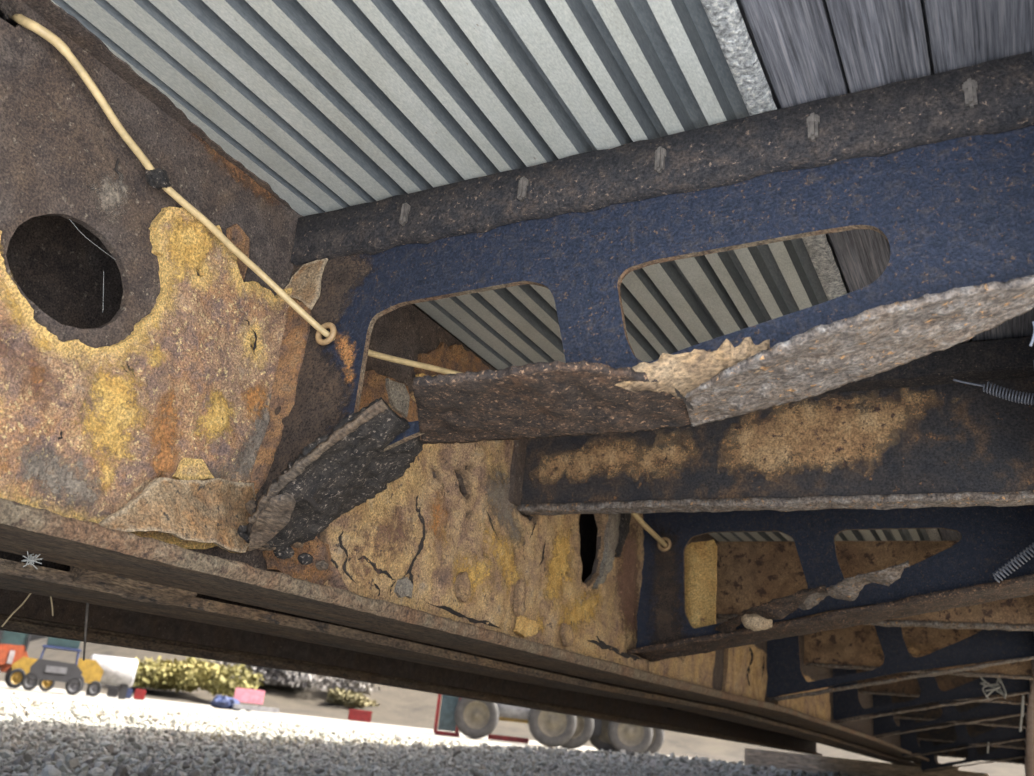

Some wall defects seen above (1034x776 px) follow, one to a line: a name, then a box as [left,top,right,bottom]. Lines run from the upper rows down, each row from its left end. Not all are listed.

rust [91,173,128,222]
rust [0,206,831,722]
rust [721,389,937,482]
crack [331,496,500,628]
rust [715,560,909,634]